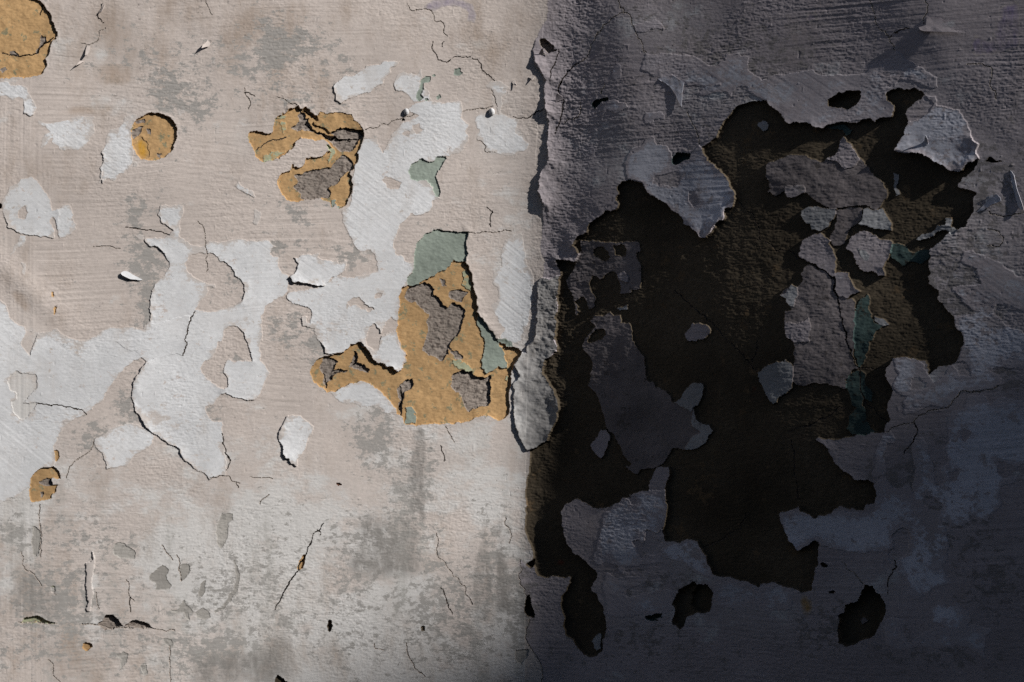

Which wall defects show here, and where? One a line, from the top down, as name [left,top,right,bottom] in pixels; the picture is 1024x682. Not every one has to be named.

peeling [0,0,185,183]
crack [407,0,647,134]
peeling [0,205,288,503]
spalling [248,52,1024,657]
crack [275,523,324,610]